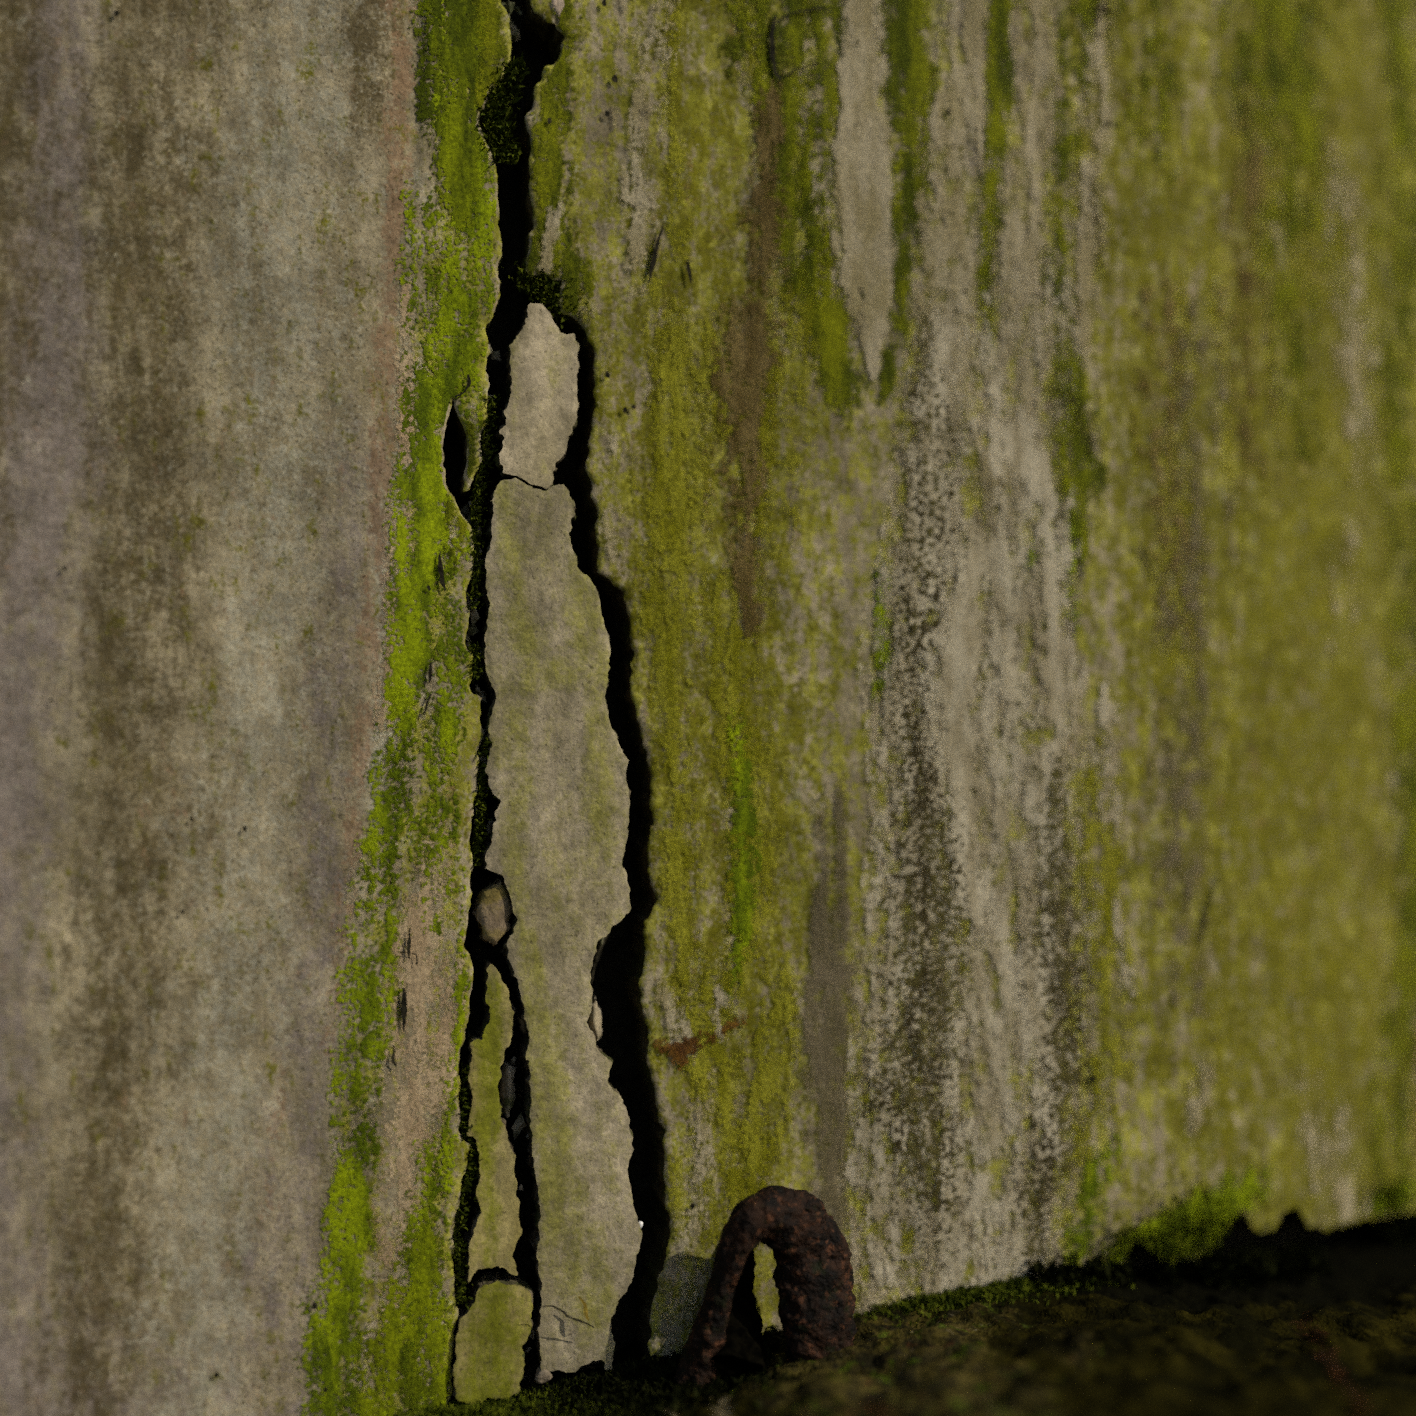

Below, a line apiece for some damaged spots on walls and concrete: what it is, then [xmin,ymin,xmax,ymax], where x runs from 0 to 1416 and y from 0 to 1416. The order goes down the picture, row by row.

crack [423,662,432,715]
crack [427,0,658,1375]
water stain [1299,1101,1415,1225]
corrosion [711,1250,768,1380]